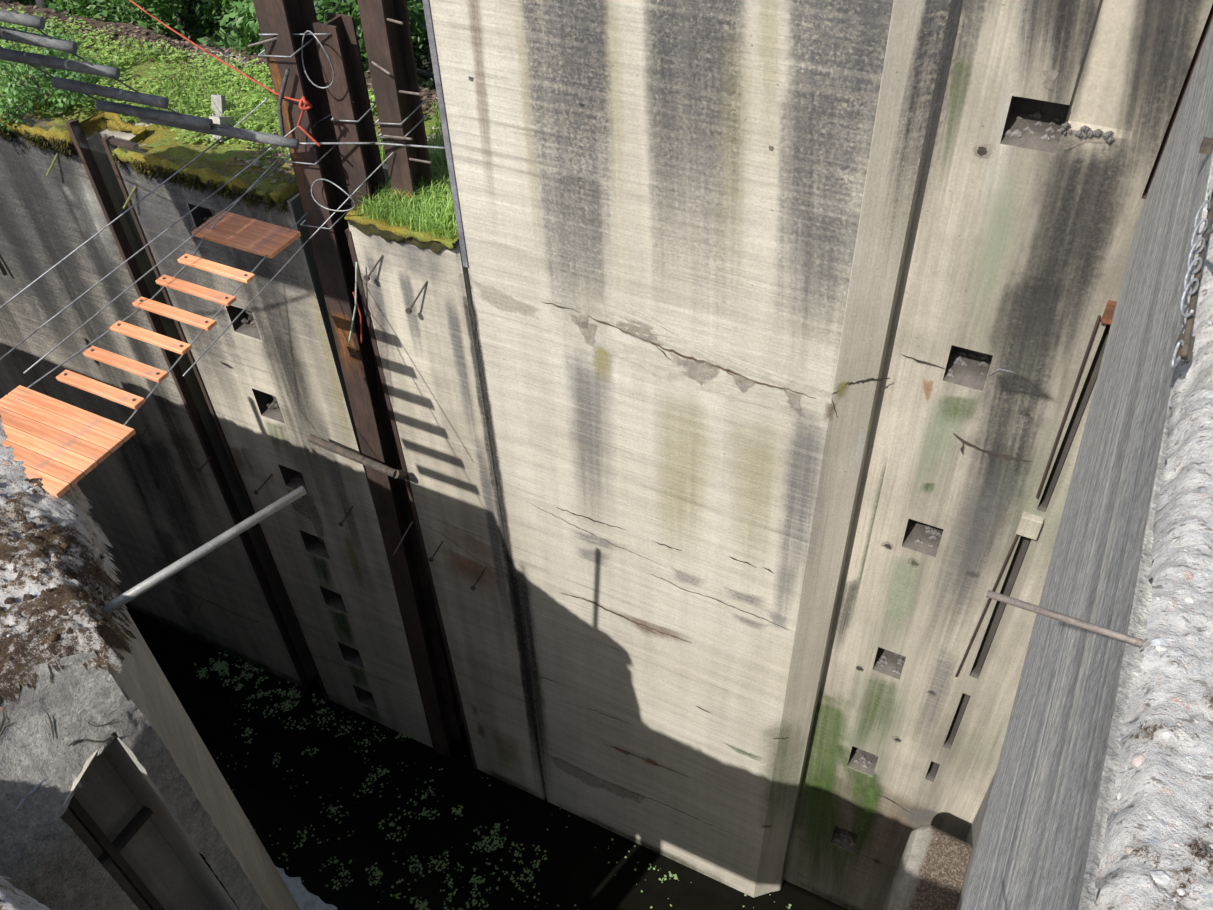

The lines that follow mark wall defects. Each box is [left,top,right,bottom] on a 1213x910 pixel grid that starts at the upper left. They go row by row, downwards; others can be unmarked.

damp [523,0,608,206]
damp [650,0,737,152]
damp [906,0,960,147]
damp [1029,0,1096,83]
damp [400,277,417,332]
damp [448,307,470,408]
crack [540,301,945,418]
damp [478,456,544,751]
crack [424,274,791,843]
crack [0,705,15,737]
crack [39,699,117,747]